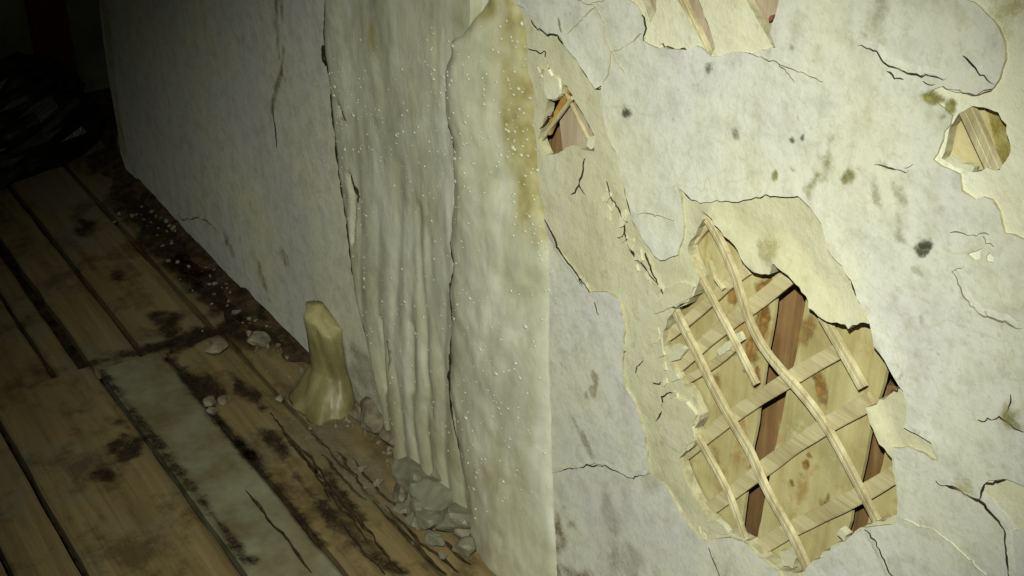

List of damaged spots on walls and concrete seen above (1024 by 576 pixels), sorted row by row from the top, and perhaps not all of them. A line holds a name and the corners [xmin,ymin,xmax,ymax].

crack [857,39,993,96]
mould [923,91,955,112]
flaking render [933,0,1024,238]
crack [572,158,687,308]
spalling [519,0,938,576]
mould [915,240,932,257]
damp [82,197,325,564]
damp [288,419,409,574]
crack [552,460,650,479]
crack [903,478,1016,576]